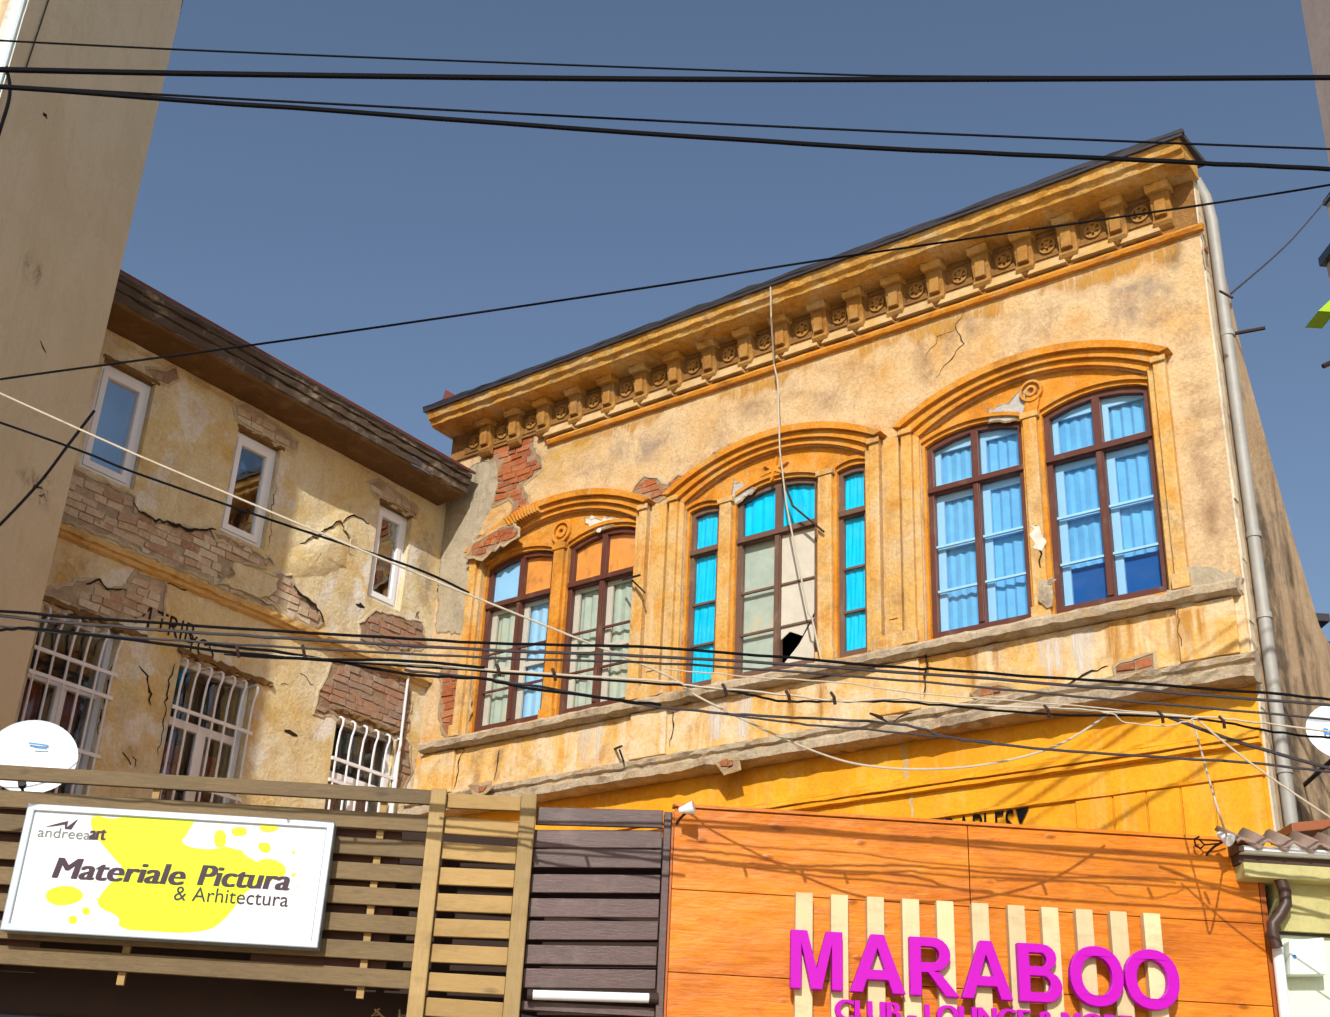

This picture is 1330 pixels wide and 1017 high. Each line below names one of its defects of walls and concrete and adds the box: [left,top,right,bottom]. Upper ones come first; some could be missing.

crack [925,311,964,376]
flaking render [42,466,325,630]
crack [269,483,370,557]
flaking render [357,435,545,656]
flaking render [312,662,414,788]